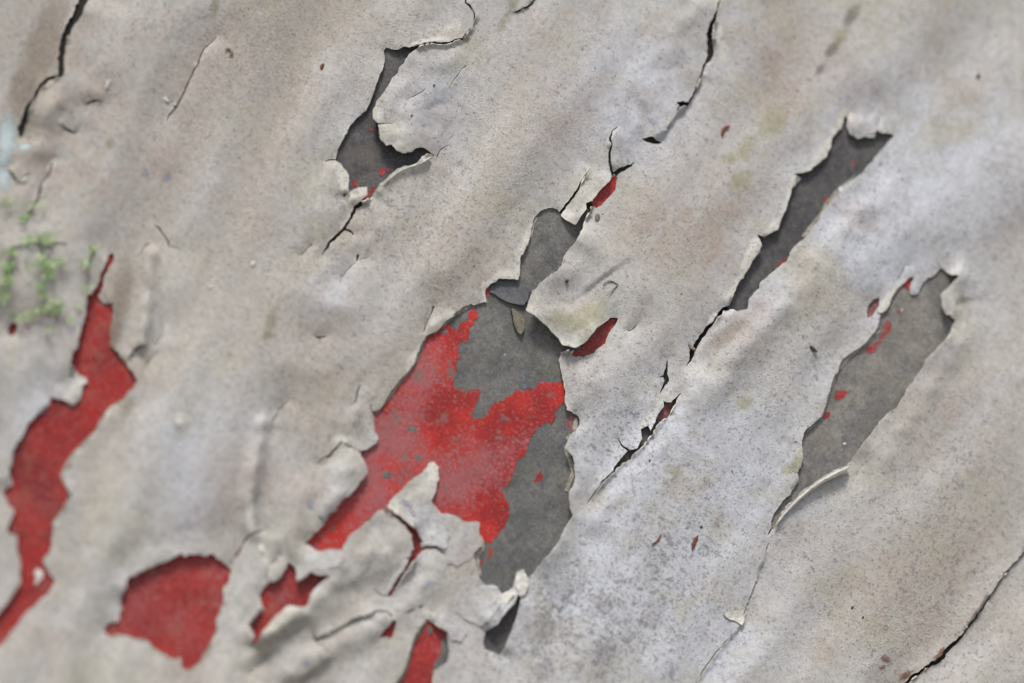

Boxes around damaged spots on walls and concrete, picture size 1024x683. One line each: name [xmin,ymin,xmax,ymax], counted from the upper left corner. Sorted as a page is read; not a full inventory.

crack [17,0,88,137]
peeling [331,0,478,206]
crack [676,1,720,111]
crack [301,201,368,277]
peeling [702,109,894,344]
peeling [0,252,150,646]
peeling [248,171,679,683]
crack [587,439,628,503]
peeling [770,262,974,531]
peeling [103,538,232,675]
crack [905,553,1024,683]